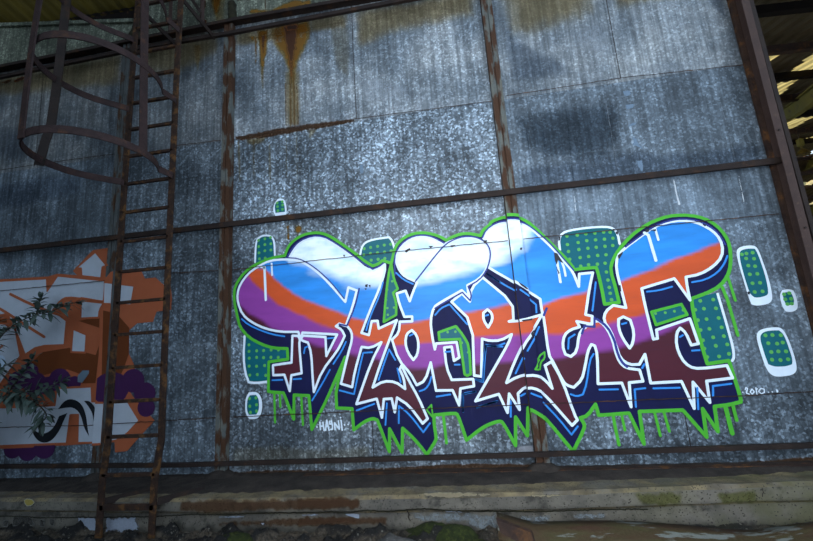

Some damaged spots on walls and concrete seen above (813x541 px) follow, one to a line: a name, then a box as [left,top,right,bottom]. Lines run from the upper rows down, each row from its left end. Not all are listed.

corrosion [236,22,354,141]
corrosion [345,463,530,471]